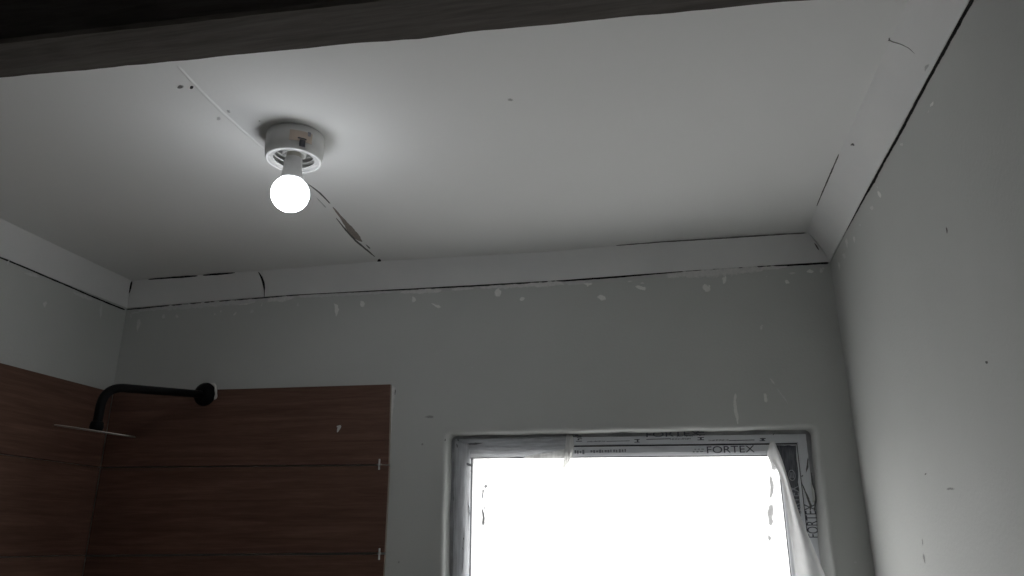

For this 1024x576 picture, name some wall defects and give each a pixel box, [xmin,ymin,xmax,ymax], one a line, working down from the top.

crack [817,154,839,205]
crack [310,185,381,262]
crack [0,257,700,310]